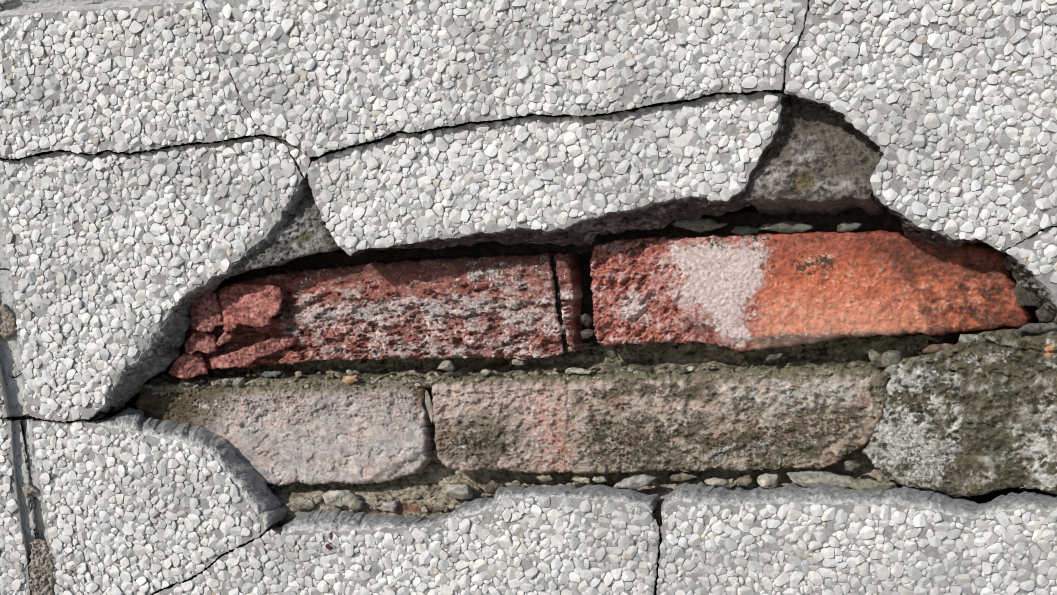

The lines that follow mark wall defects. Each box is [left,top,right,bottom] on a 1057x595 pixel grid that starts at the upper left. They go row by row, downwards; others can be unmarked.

crack [0,0,810,180]
spalling [351,94,1057,324]
spalling [89,179,1057,534]
crack [0,406,115,539]
crack [150,521,284,595]
crack [652,501,663,595]